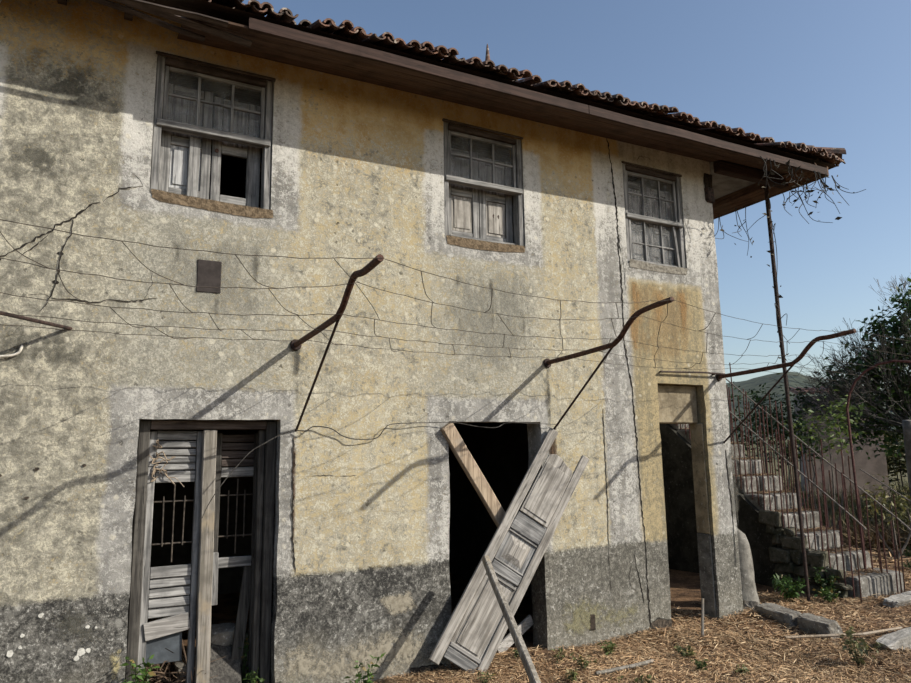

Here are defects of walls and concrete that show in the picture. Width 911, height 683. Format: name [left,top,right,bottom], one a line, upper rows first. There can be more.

crack [0,172,157,337]
crack [602,138,651,629]